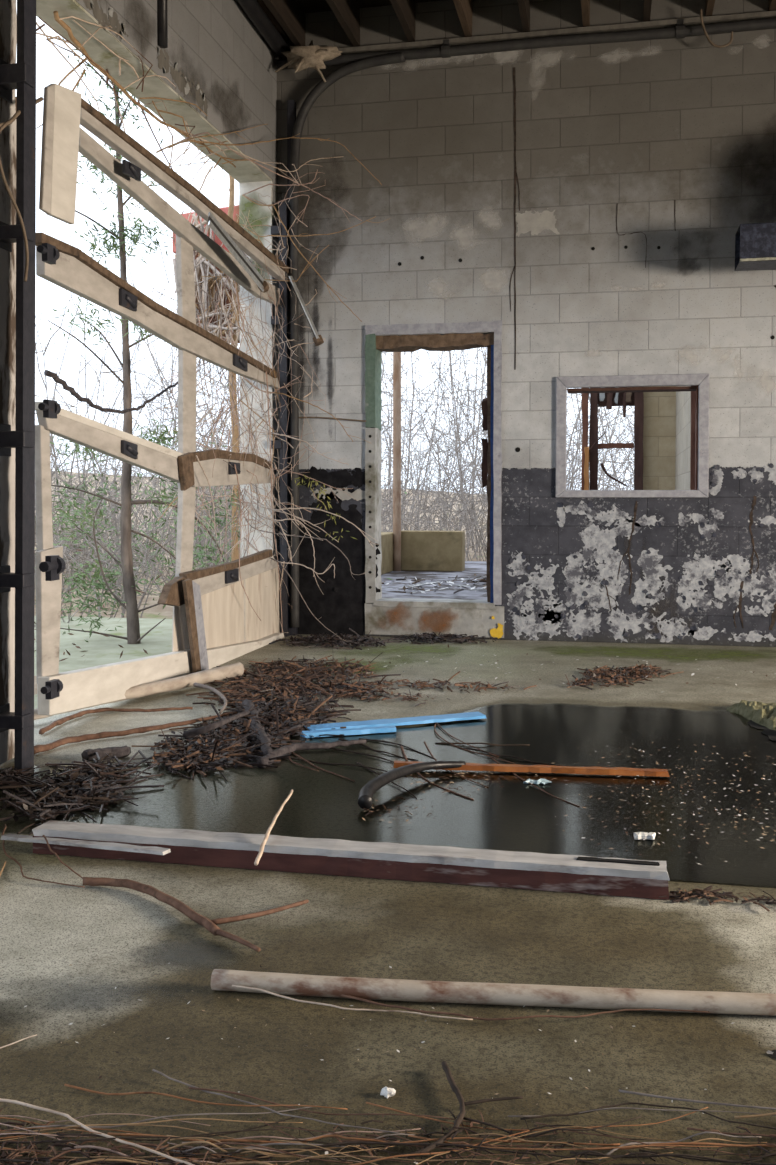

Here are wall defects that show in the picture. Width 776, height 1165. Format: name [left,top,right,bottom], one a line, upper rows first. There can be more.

corrosion [421,612,453,631]
peeling [492,463,776,654]